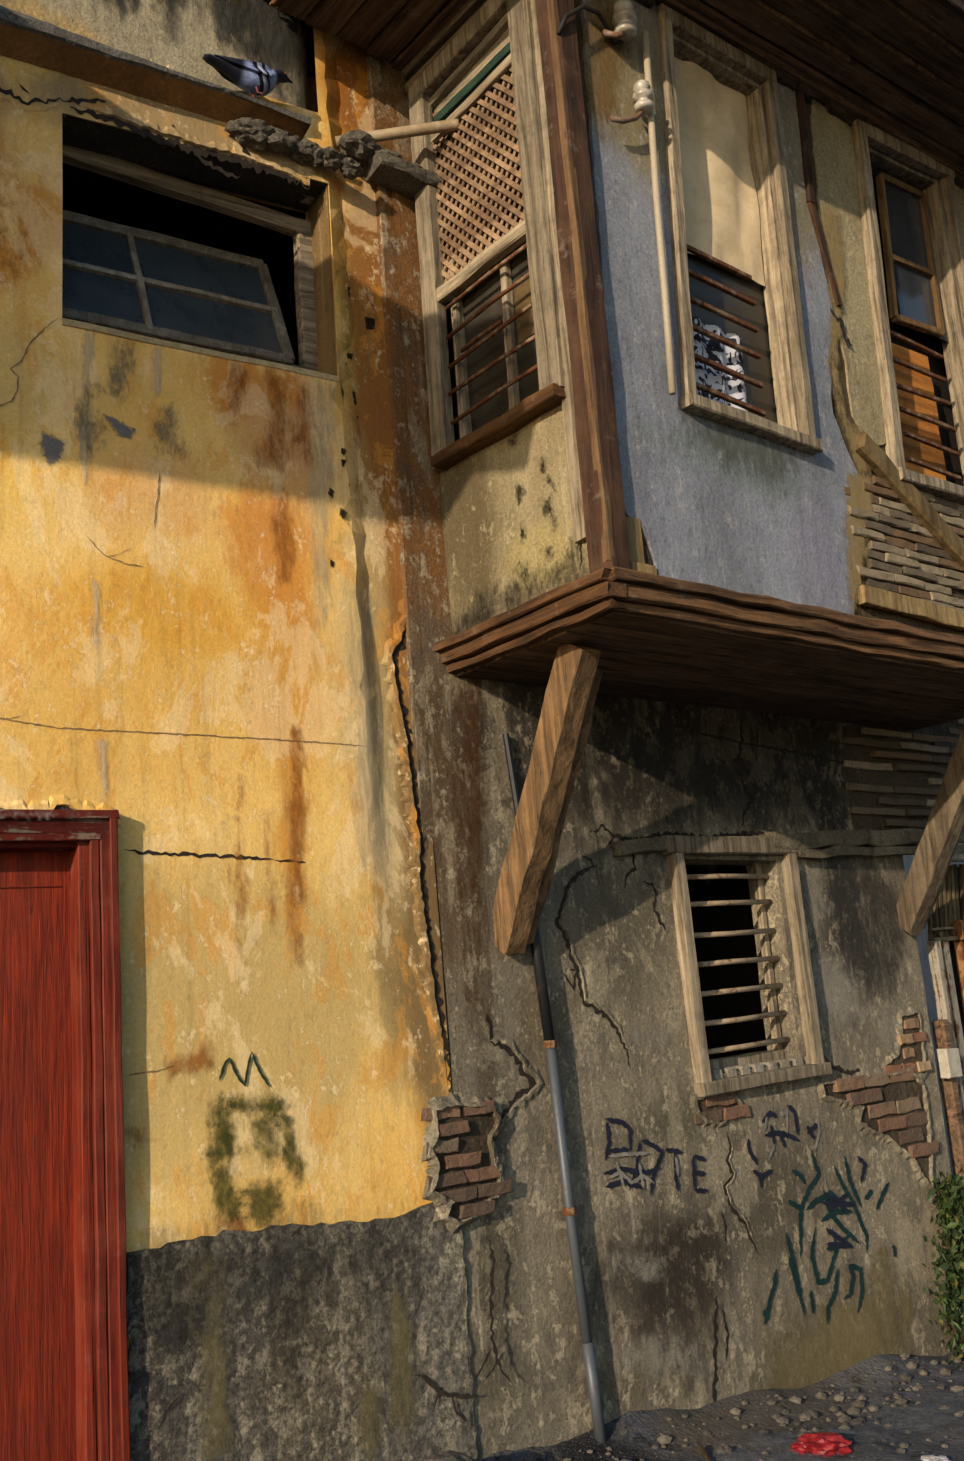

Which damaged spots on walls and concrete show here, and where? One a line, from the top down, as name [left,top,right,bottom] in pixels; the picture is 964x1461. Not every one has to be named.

water stain [163,0,305,102]
crack [0,84,310,190]
rust [259,377,309,470]
mould [540,461,555,523]
mould [453,542,584,635]
flaking render [0,794,121,828]
crack [0,590,453,1096]
rust [289,727,303,899]
crack [555,716,843,1068]
crack [486,1013,544,1130]
flaking render [817,1007,939,1191]
flaking render [421,1092,512,1233]